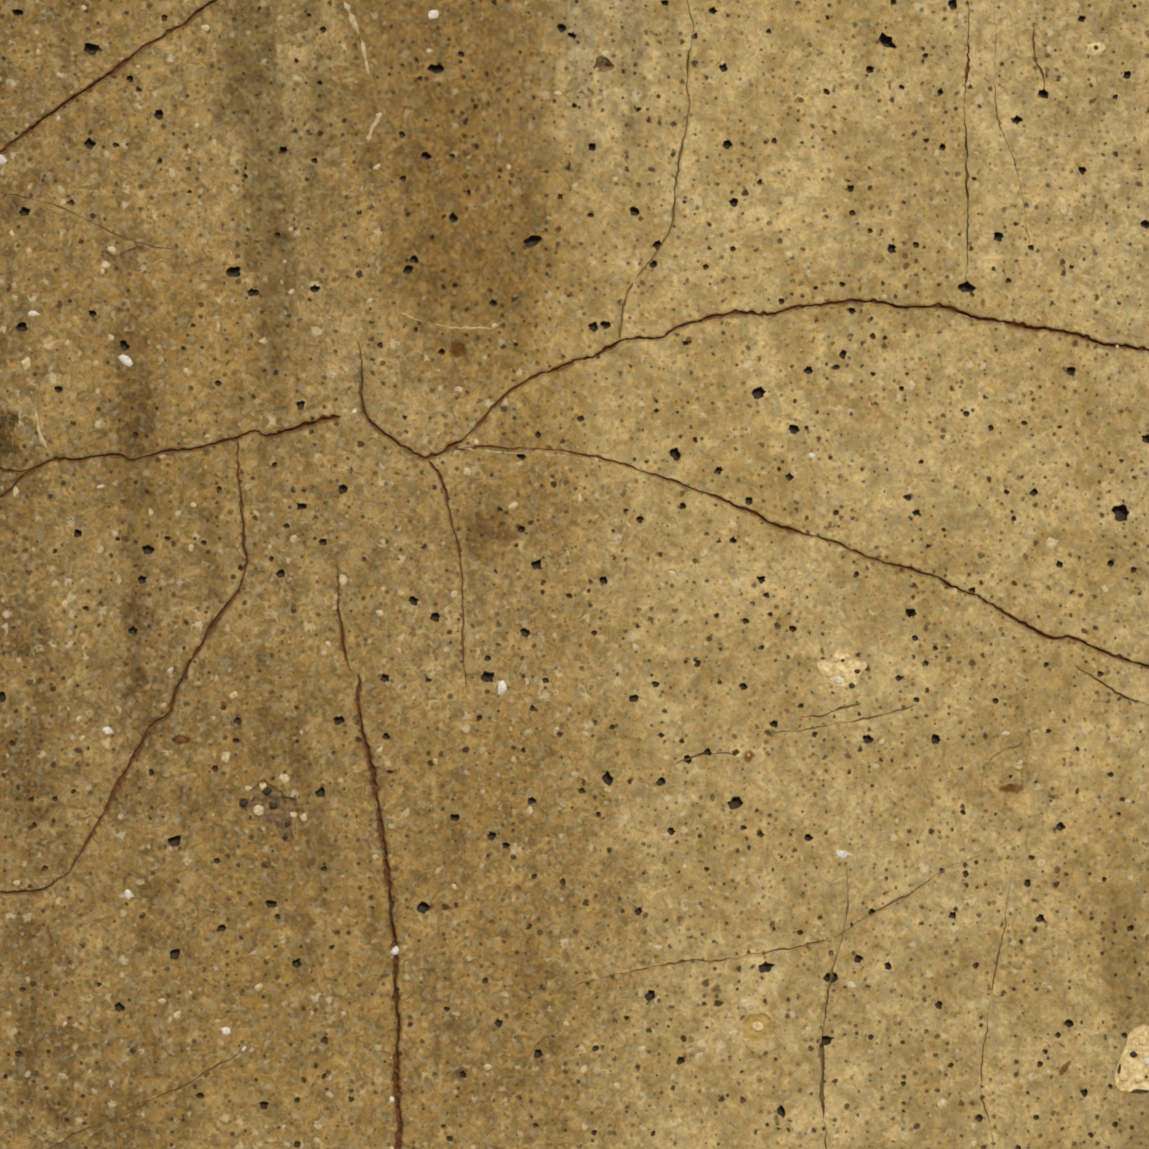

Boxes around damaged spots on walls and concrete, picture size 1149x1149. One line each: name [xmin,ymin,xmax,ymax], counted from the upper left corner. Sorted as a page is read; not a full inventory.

damp [0,411,22,462]
damp [35,395,47,448]
crack [0,0,1149,894]
crack [333,564,403,1149]